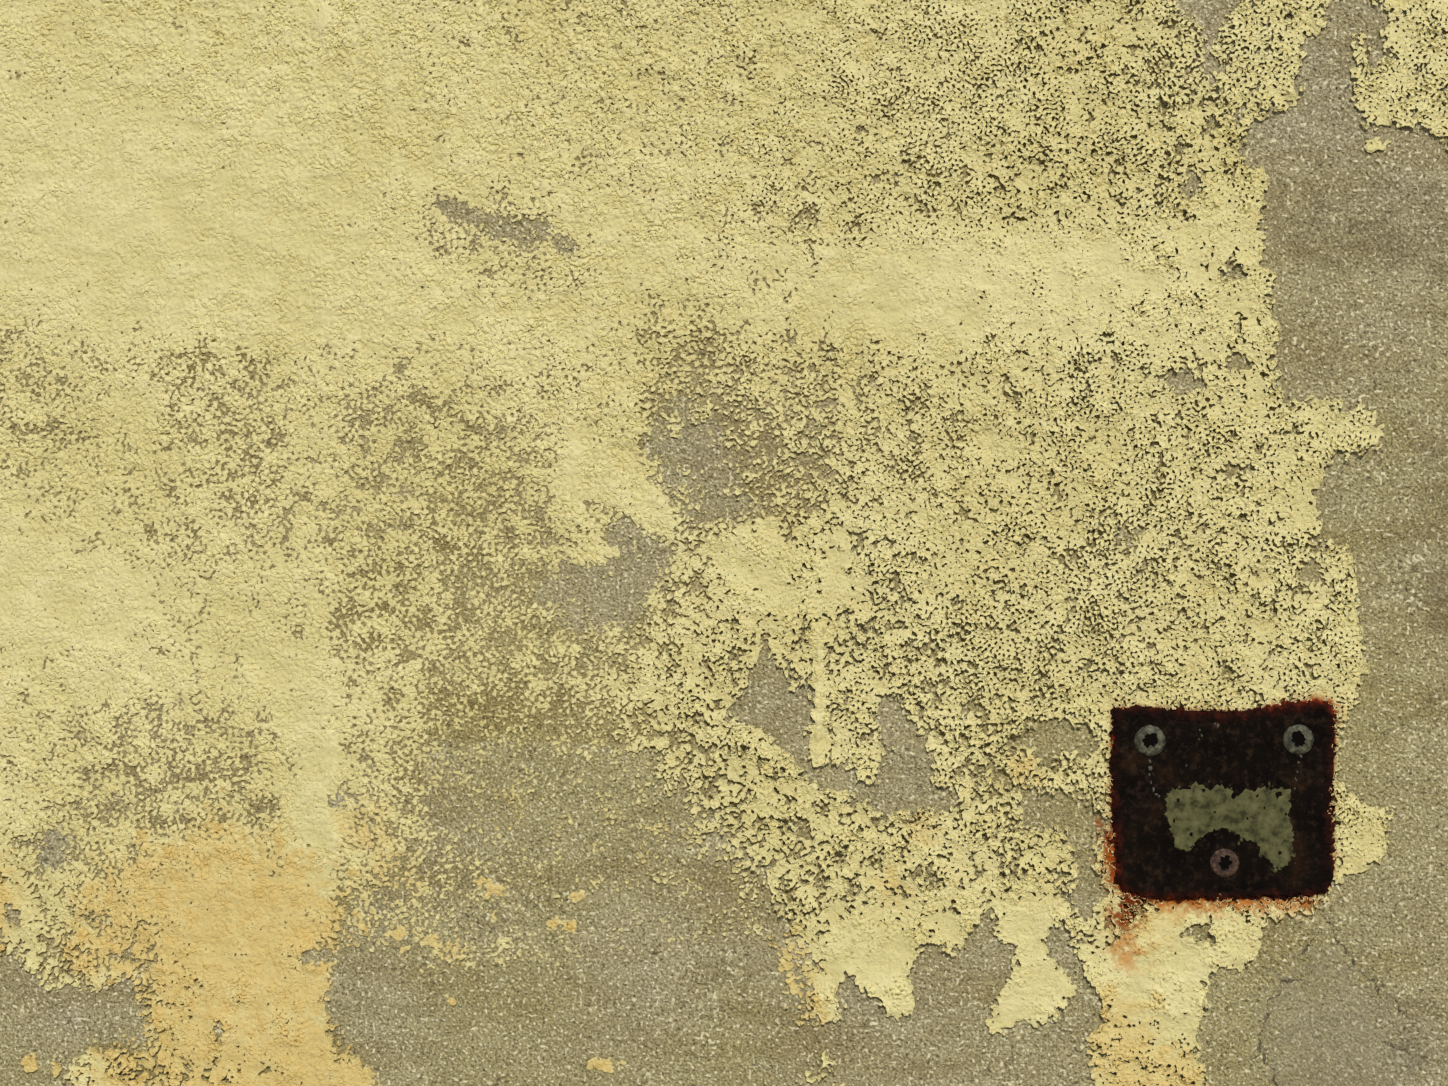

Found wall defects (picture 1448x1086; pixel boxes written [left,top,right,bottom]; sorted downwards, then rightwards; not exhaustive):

peeling [1220,255,1251,285]
peeling [765,462,817,485]
peeling [461,573,495,609]
peeling [495,601,577,725]
peeling [430,673,452,693]
peeling [453,697,486,731]
peeling [489,706,517,734]
peeling [510,693,551,735]
rust [1096,697,1339,928]
peeling [0,903,150,1086]